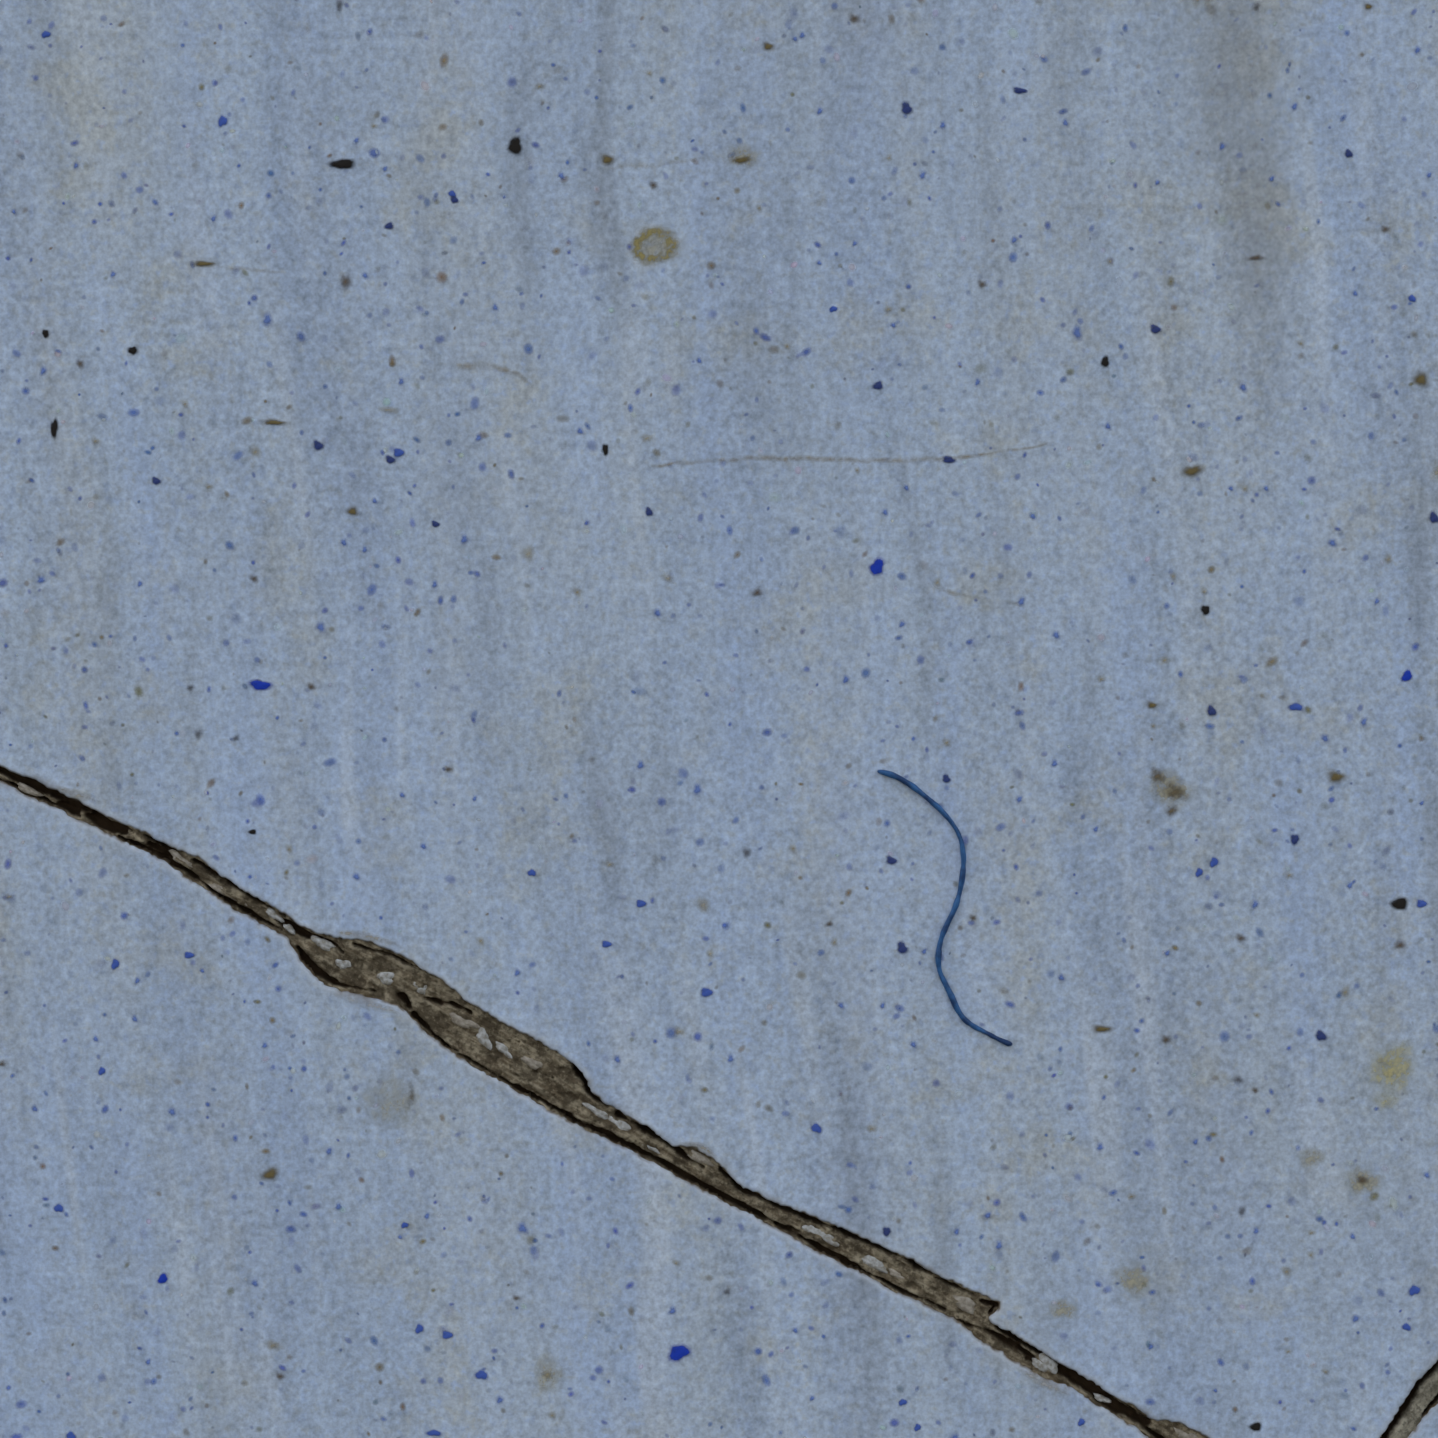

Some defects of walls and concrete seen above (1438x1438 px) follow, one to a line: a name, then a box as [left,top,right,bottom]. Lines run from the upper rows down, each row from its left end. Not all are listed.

crack [0,766,1208,1438]
crack [1380,1360,1438,1438]